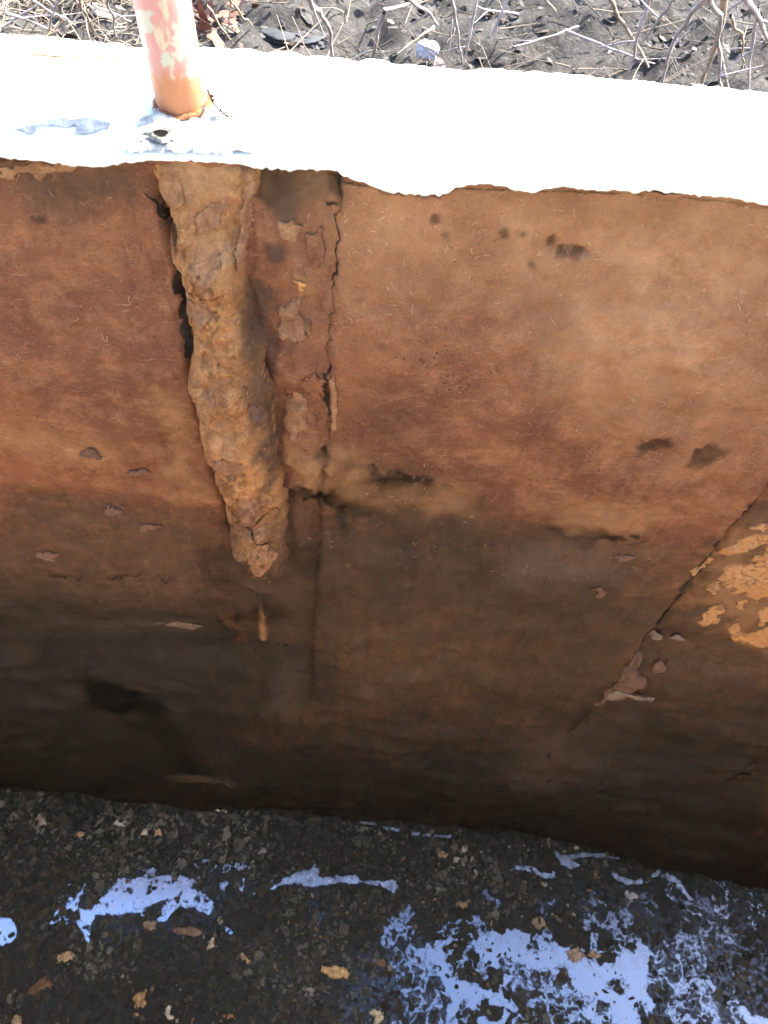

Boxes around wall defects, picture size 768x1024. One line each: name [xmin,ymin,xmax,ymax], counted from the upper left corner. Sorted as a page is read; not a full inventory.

crack [1,149,343,712]
peeling [593,651,666,707]
peeling [647,630,686,642]
crack [639,503,753,649]
peeling [690,522,768,648]